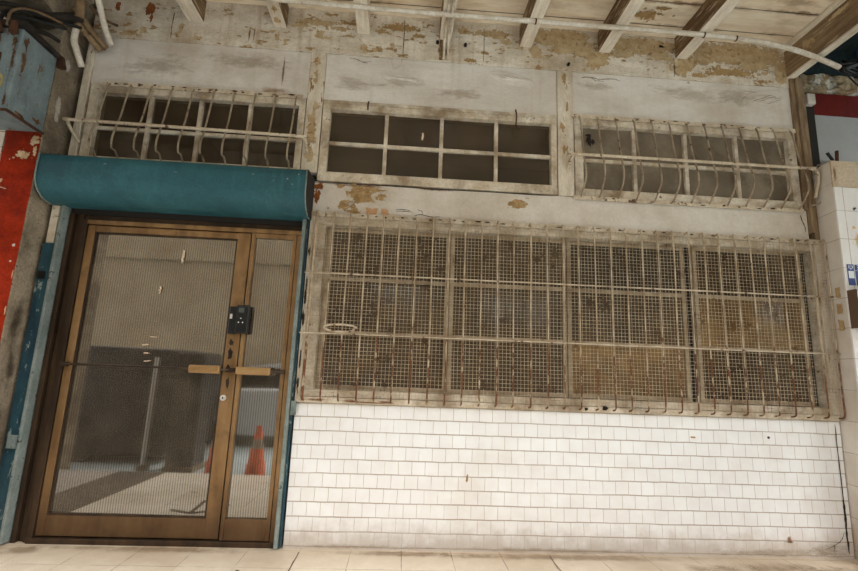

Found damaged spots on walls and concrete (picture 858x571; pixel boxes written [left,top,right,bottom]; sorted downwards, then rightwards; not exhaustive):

peeling [109,2,159,39]
peeling [267,4,377,54]
peeling [371,16,432,47]
peeling [455,25,787,87]
spalling [800,74,858,97]
spalling [508,197,529,209]